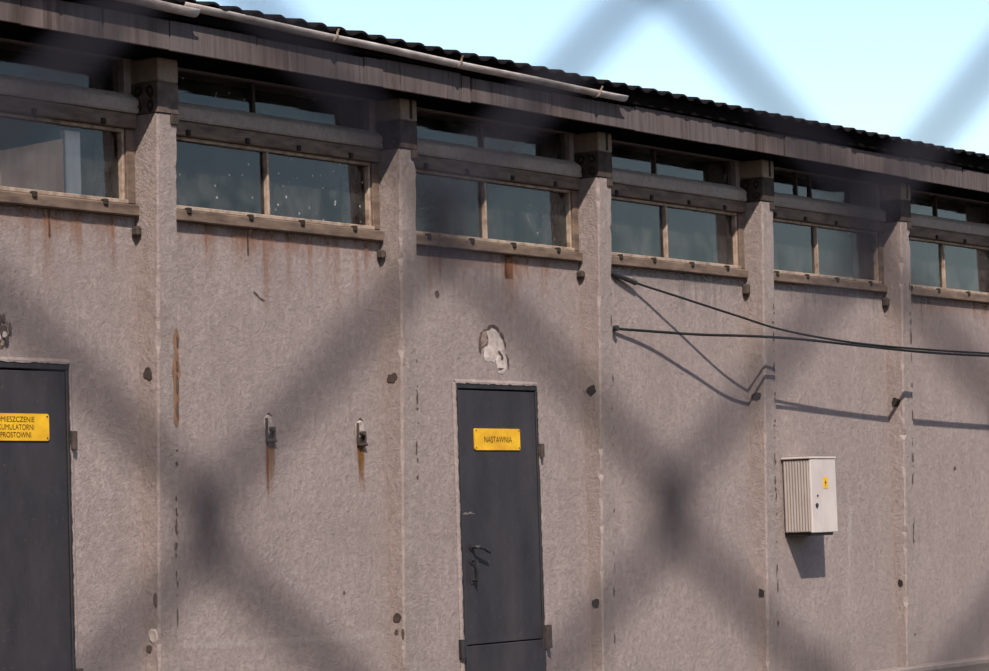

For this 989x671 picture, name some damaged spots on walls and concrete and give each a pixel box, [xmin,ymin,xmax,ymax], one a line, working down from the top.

spalling [0,318,12,349]
peeling [479,325,509,374]